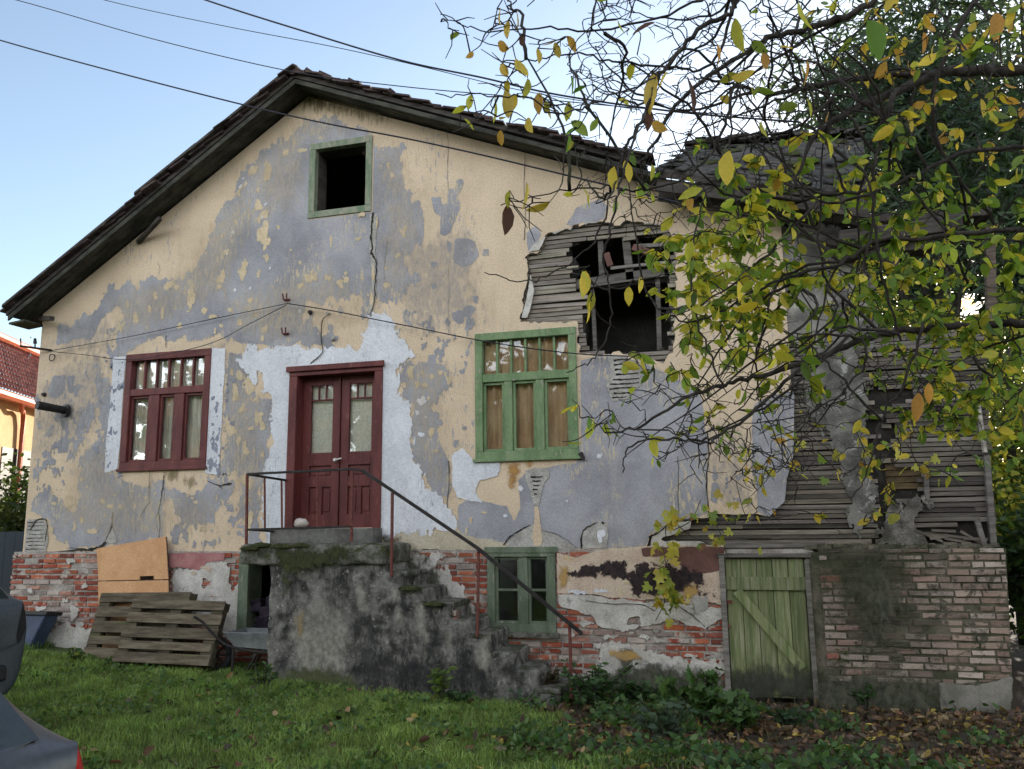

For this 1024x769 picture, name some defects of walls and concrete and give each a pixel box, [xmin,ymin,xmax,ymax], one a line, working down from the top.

crack [358,212,388,315]
peeling [567,200,607,225]
peeling [10,114,489,666]
water stain [277,557,502,699]
water stain [408,549,448,596]
peeling [399,354,726,693]
water stain [597,649,941,712]
flaking render [751,223,1013,687]